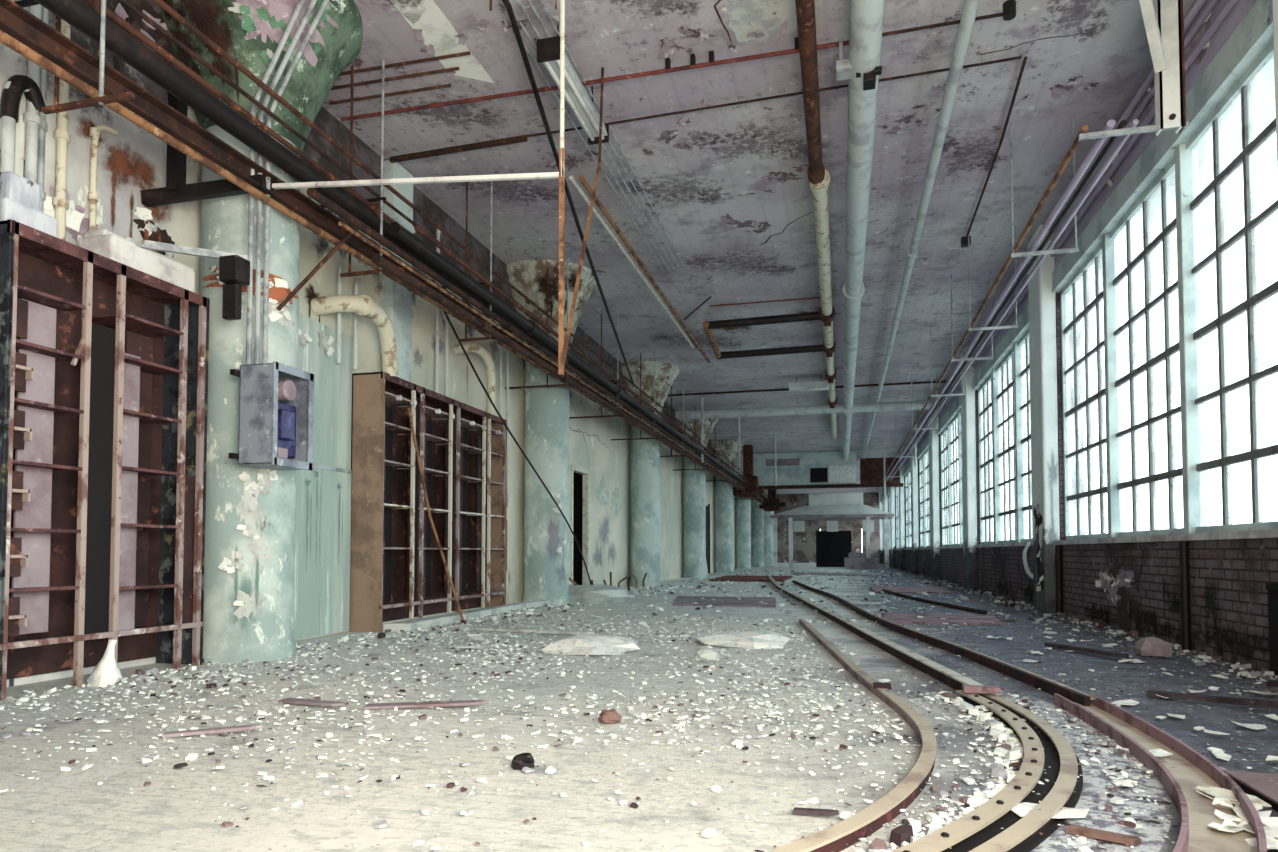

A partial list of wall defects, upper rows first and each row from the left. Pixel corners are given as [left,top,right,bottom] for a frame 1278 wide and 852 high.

peeling [110,0,180,70]
peeling [228,0,345,86]
flaking render [390,0,528,83]
rust [81,119,168,254]